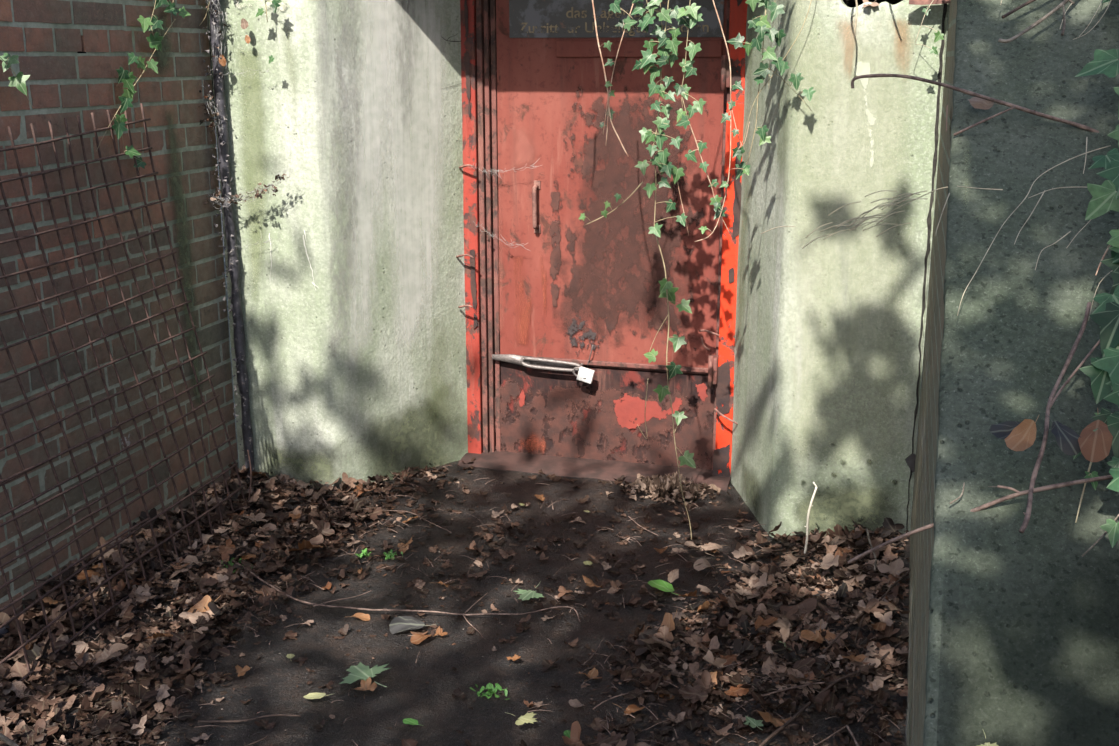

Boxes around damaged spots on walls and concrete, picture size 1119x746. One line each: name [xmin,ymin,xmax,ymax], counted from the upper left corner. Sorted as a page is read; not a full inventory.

water stain [854,62,876,167]
rust [549,87,708,351]
rust [495,378,714,470]
peeling [613,393,682,429]
spalling [696,362,731,416]
spalling [712,444,731,482]